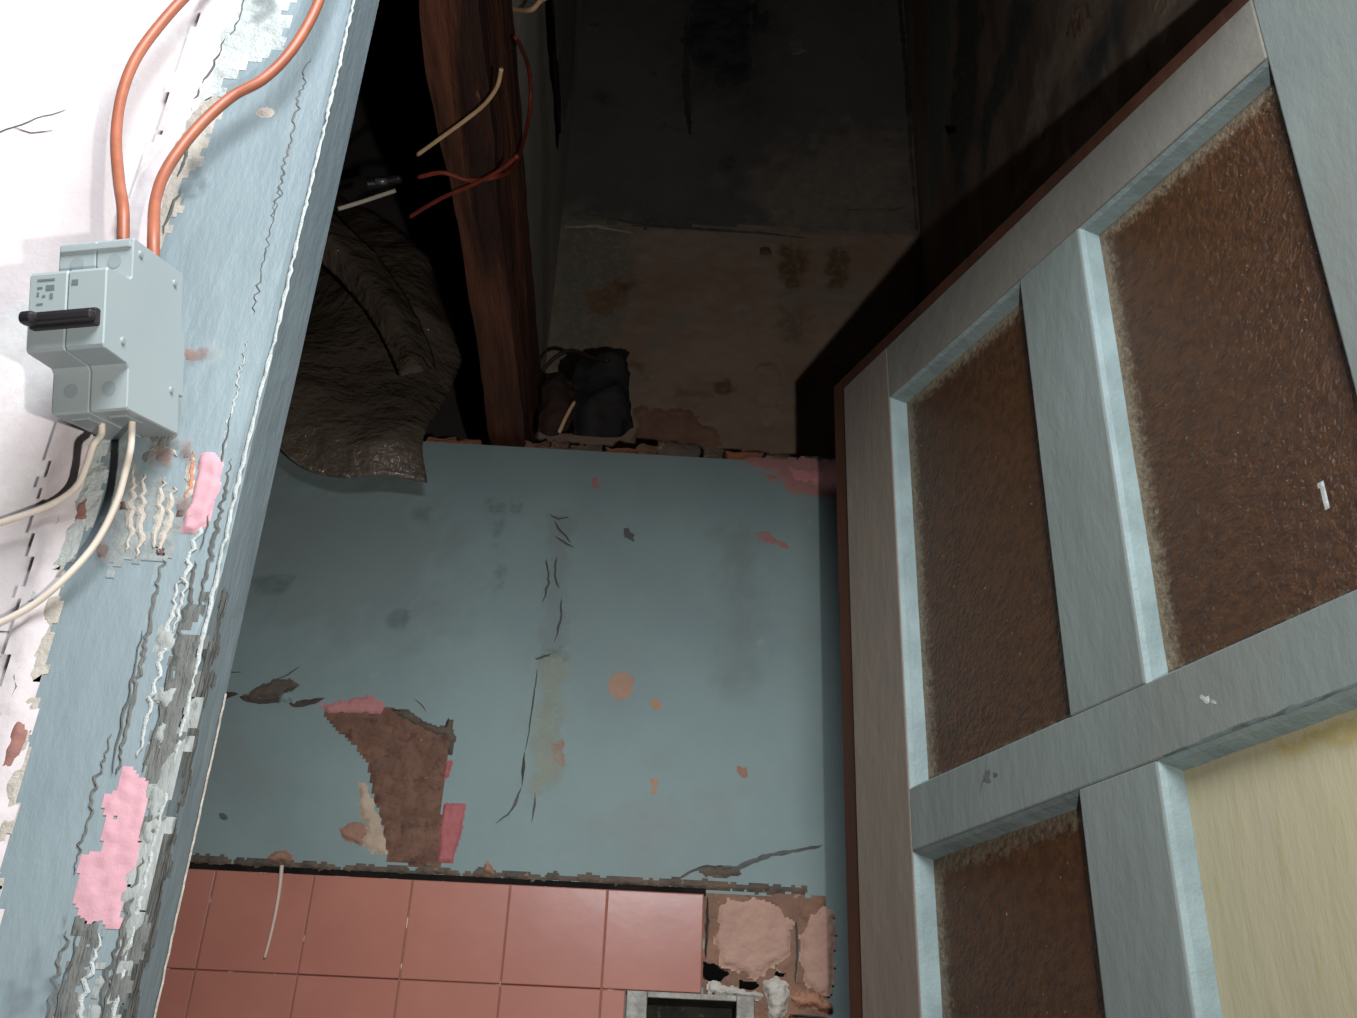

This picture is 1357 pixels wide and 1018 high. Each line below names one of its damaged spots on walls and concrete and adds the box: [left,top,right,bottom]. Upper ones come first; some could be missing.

flaking render [525,209,920,499]
peeling [0,0,837,1018]
crack [226,667,324,707]
crack [497,669,538,823]
crack [679,845,822,879]